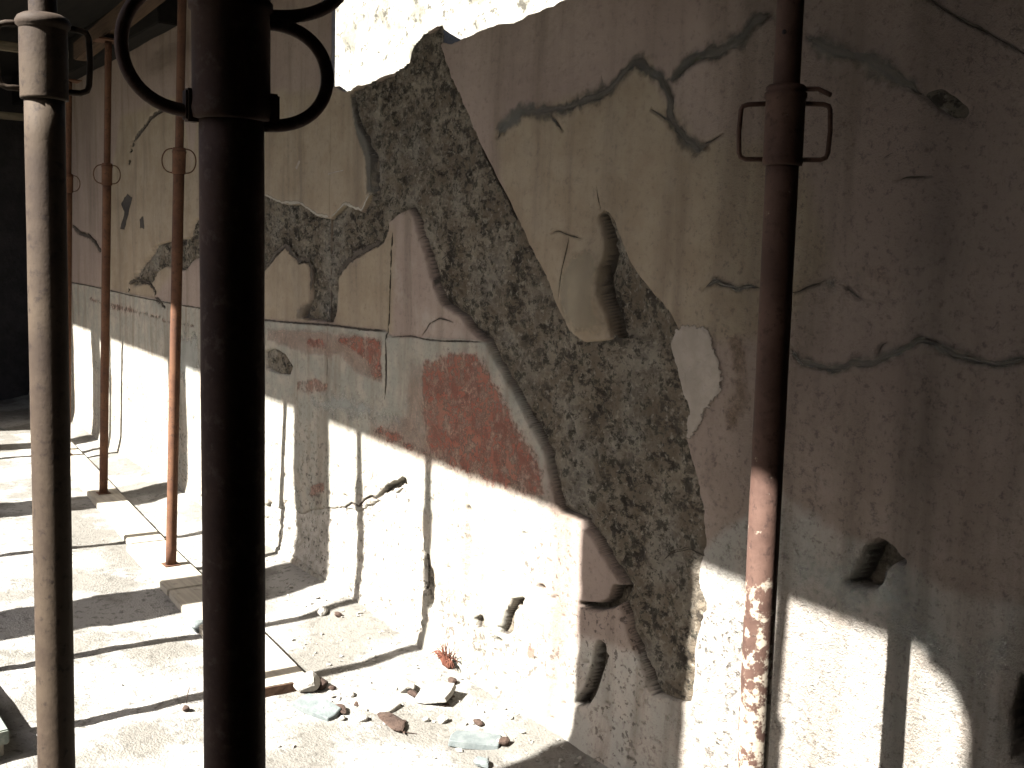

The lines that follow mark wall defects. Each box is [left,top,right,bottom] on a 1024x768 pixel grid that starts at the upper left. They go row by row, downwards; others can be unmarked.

crack [482,13,768,218]
flaking render [136,220,199,285]
crack [707,277,758,292]
flaking render [265,25,707,701]
crack [792,337,1024,373]
crack [345,496,379,508]
spalling [867,543,905,584]